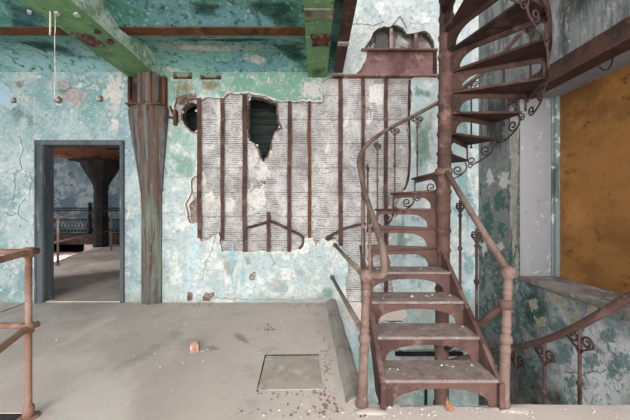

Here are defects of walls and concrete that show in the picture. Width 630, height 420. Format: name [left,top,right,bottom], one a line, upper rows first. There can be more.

spalling [172,10,439,302]
crack [4,143,33,221]
peeling [528,298,547,328]
peeling [602,327,620,344]
peeling [551,342,576,389]